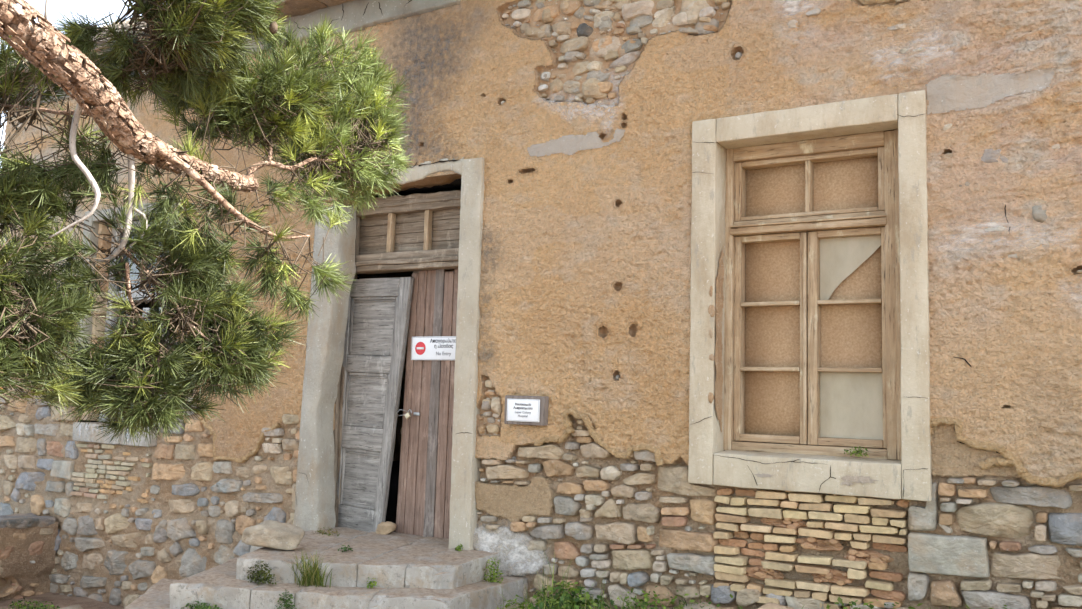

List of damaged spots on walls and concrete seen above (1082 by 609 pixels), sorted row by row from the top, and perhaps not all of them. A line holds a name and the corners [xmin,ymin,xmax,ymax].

peeling [496,0,732,106]
flaking render [197,404,281,463]
flaking render [534,408,665,466]
crack [718,455,836,491]
flaking render [930,417,1082,487]
spalling [746,566,784,581]
spalling [761,517,894,586]